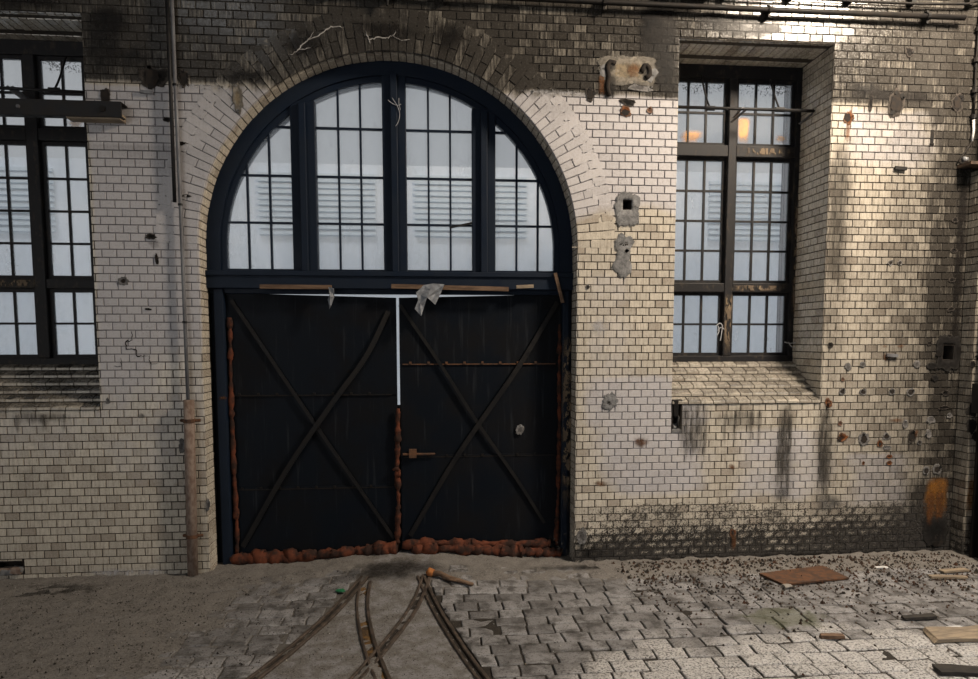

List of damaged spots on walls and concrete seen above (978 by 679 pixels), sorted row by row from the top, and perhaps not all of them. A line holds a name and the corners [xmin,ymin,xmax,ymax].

crack [290,26,343,55]
crack [366,31,410,42]
spalling [623,194,640,210]
water stain [778,419,792,496]
water stain [819,432,828,485]